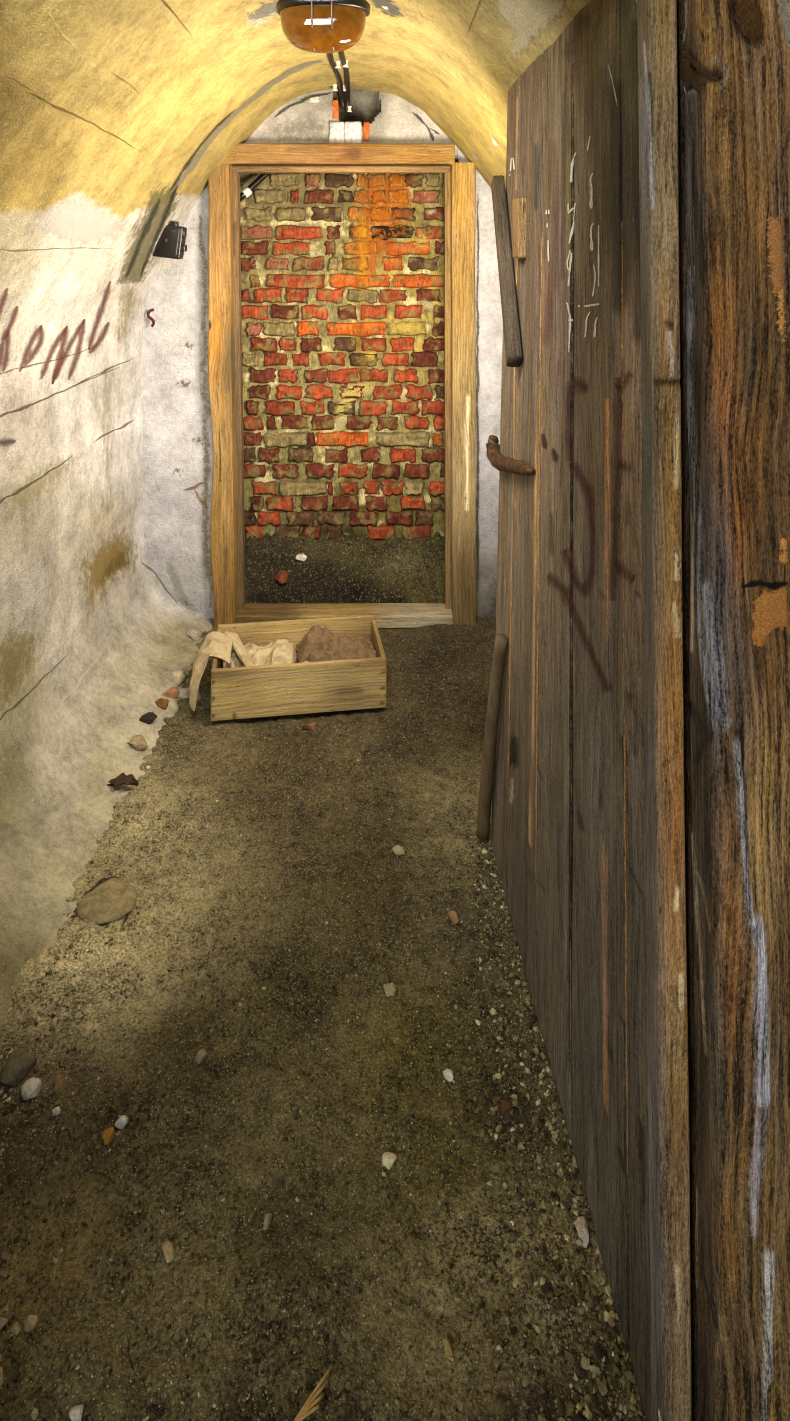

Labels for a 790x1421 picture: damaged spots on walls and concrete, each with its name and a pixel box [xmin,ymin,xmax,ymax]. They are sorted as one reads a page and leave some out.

water stain [82,539,135,606]